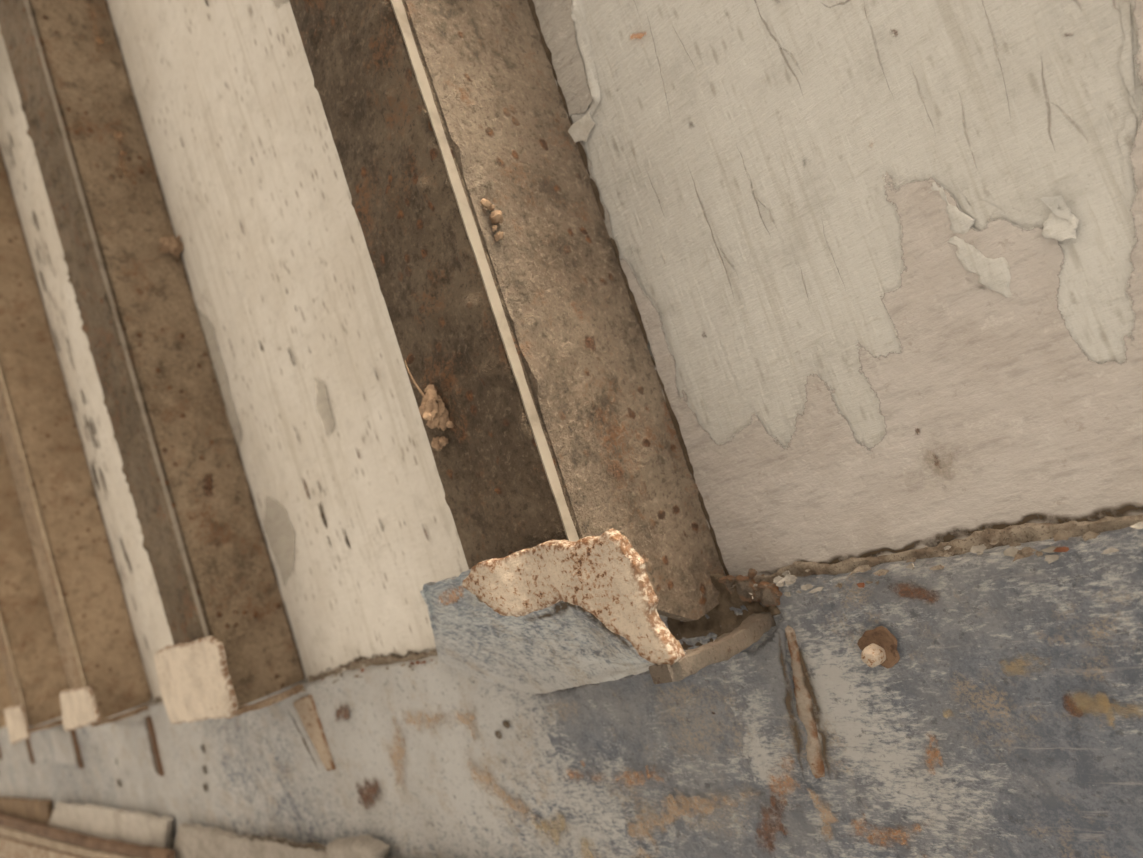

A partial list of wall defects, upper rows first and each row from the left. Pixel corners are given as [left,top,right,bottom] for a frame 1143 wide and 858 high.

peeling [533,0,600,188]
peeling [601,0,1143,577]
crack [731,504,1143,599]
corrosion [356,780,381,809]